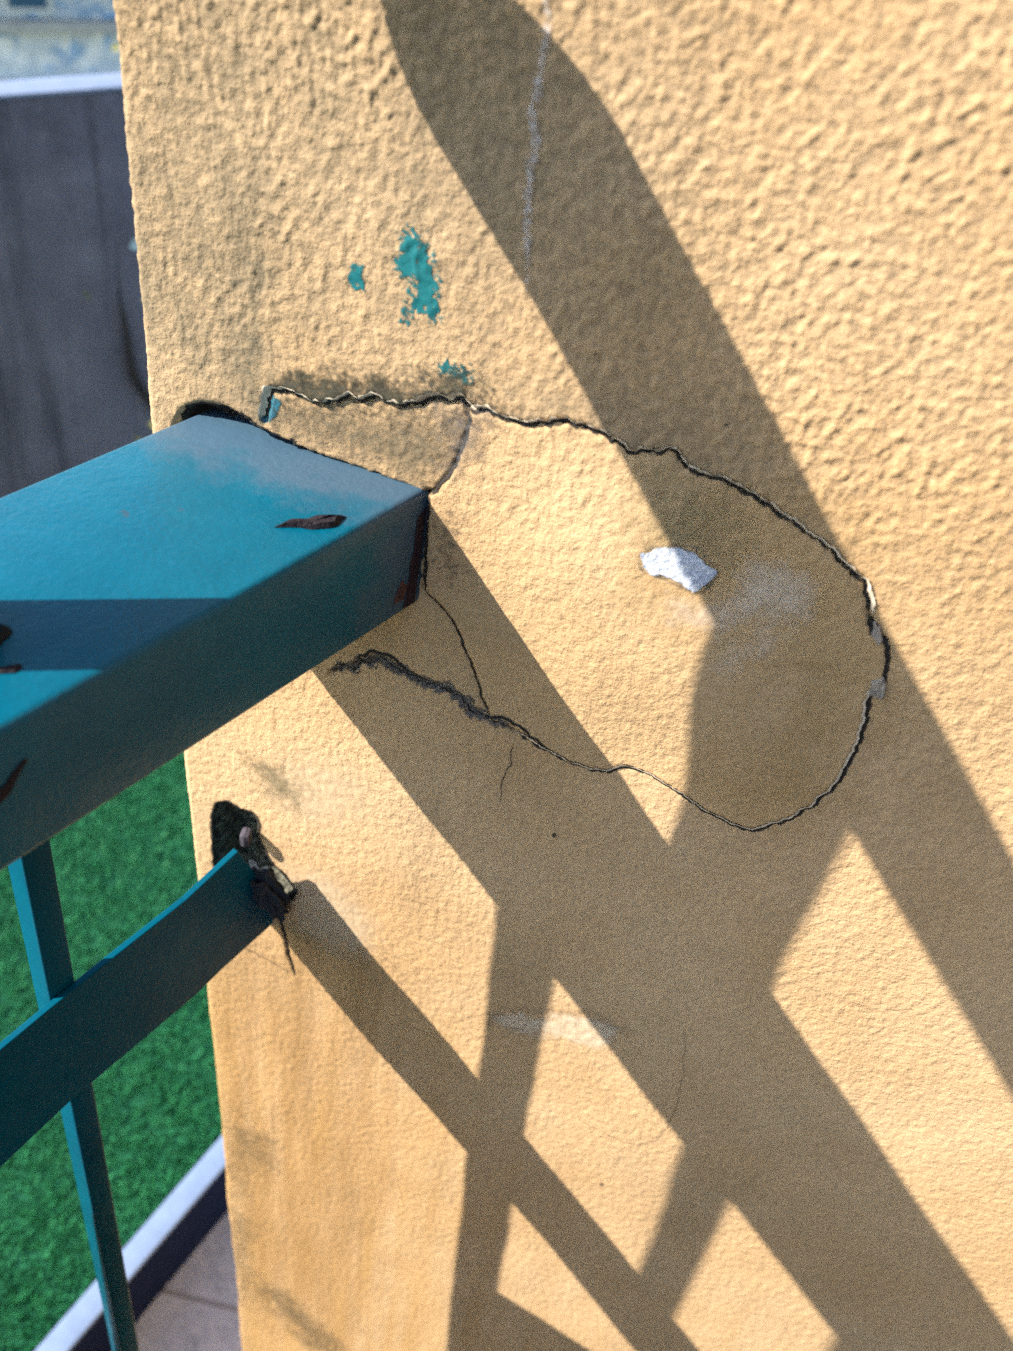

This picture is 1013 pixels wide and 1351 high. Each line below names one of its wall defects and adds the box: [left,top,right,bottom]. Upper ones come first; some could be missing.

damp [271,367,494,409]
rust [393,507,427,609]
crack [258,385,890,832]
peeling [638,544,717,593]
spalling [209,801,298,901]
peeling [494,1013,617,1047]